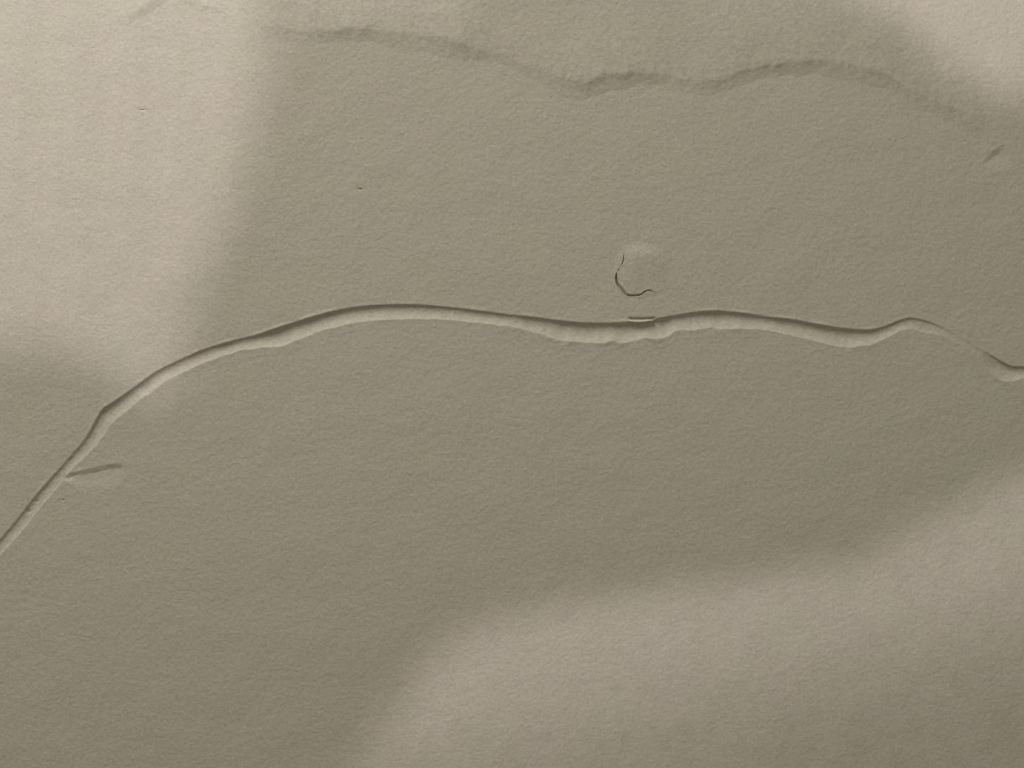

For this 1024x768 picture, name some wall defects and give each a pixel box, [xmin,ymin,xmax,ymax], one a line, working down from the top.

crack [0,280,1024,568]